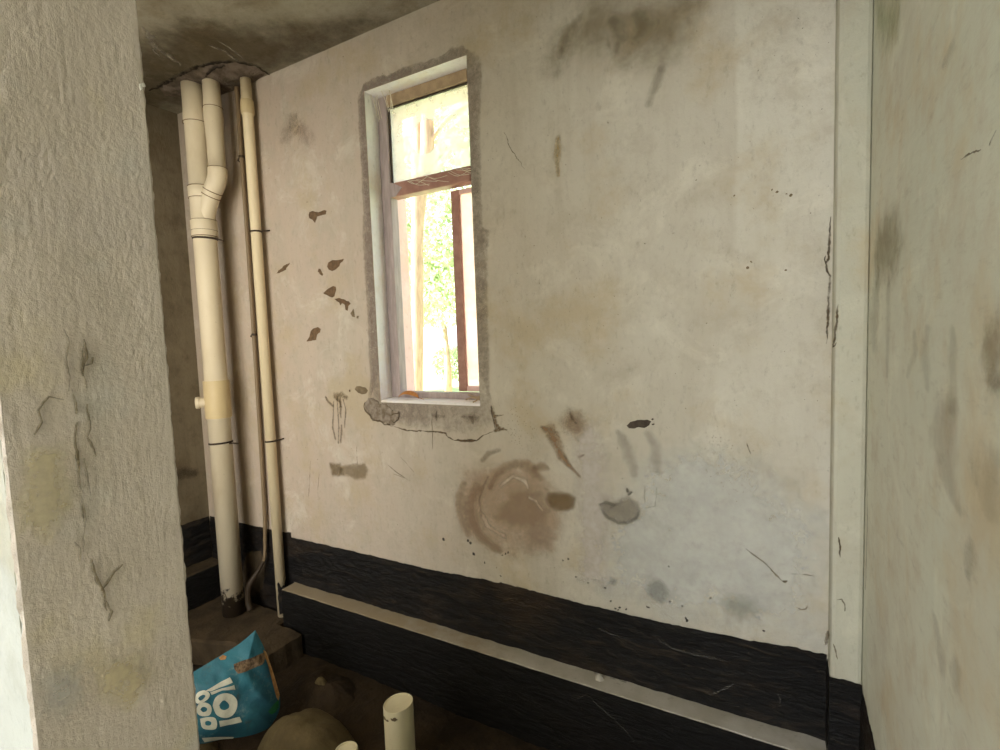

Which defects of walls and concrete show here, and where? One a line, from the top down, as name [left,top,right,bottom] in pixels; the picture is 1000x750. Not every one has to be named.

crack [142,27,269,91]
flaking render [309,210,326,222]
flaking render [318,259,344,275]
flaking render [324,286,359,318]
crack [824,217,838,347]
flaking render [307,327,321,341]
crack [34,339,97,519]
leakage [325,393,347,441]
leakage [510,407,579,476]
flaking render [627,418,654,429]
leakage [501,476,574,511]
crack [75,542,123,621]